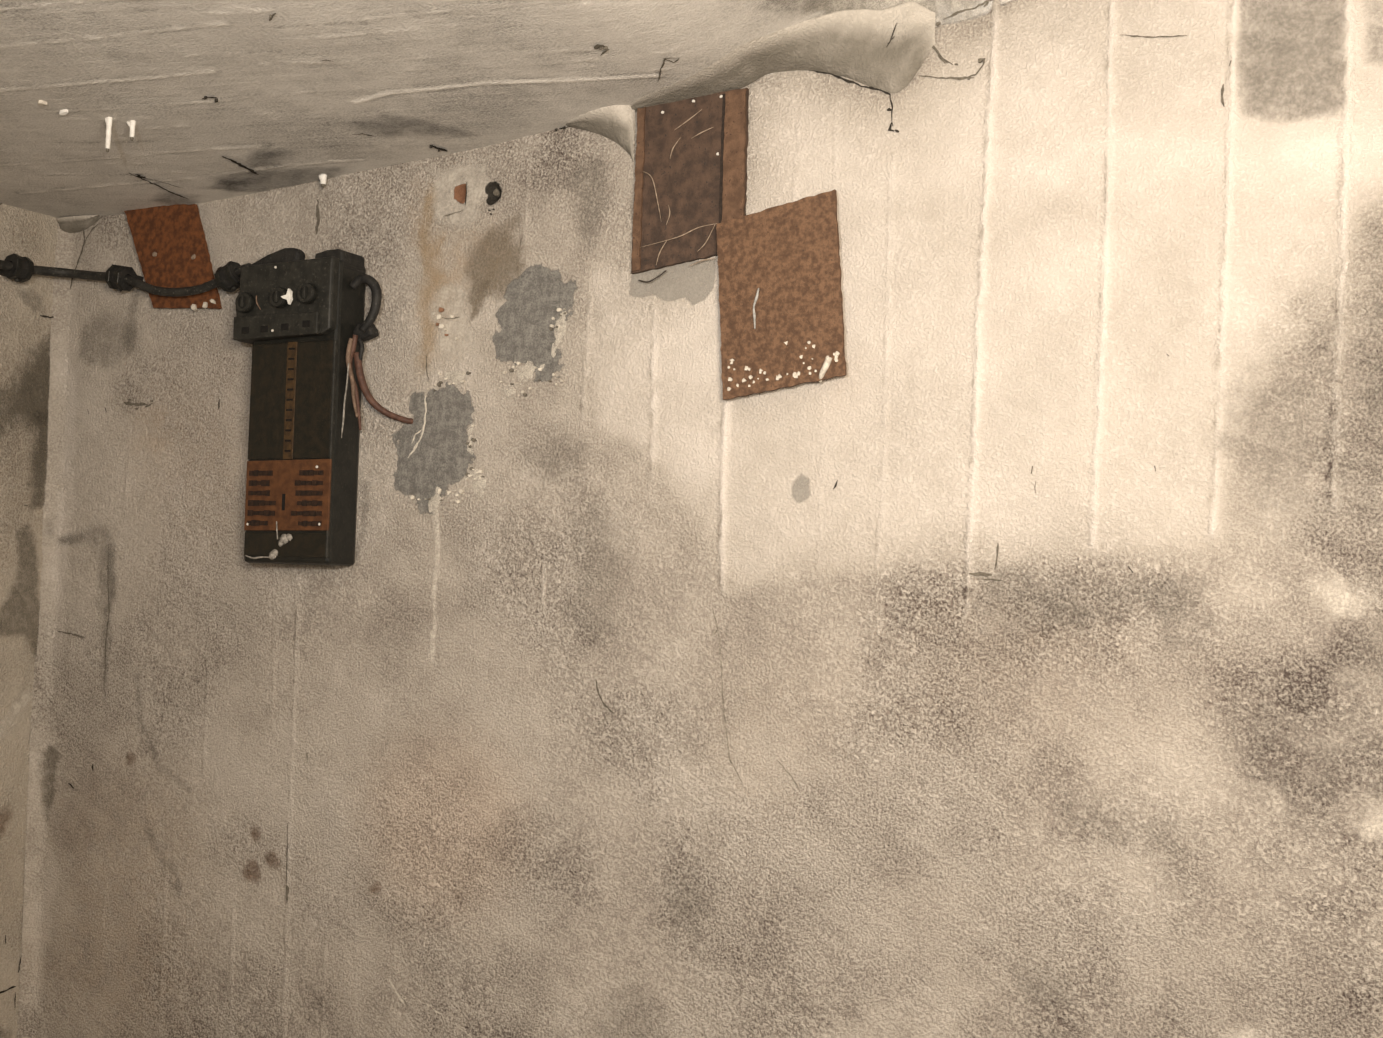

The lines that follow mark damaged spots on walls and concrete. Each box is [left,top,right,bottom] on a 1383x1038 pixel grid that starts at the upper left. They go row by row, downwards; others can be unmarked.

crack [812,70,899,133]
crack [919,0,992,80]
peeling [492,264,577,397]
water stain [0,346,50,506]
peeling [392,286,487,515]
water stain [793,476,809,502]
water stain [0,531,40,654]
water stain [1316,579,1361,617]